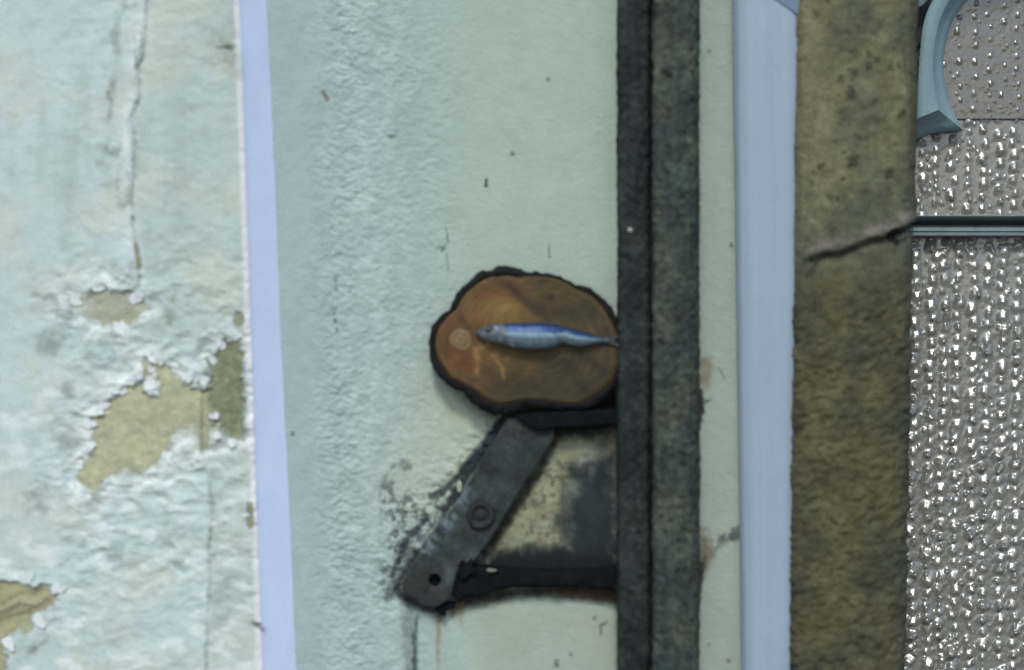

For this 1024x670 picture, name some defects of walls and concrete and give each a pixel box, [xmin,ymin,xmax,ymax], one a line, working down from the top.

crack [887,230,906,245]
peeling [69,278,146,335]
peeling [68,340,246,498]
peeling [0,571,66,670]